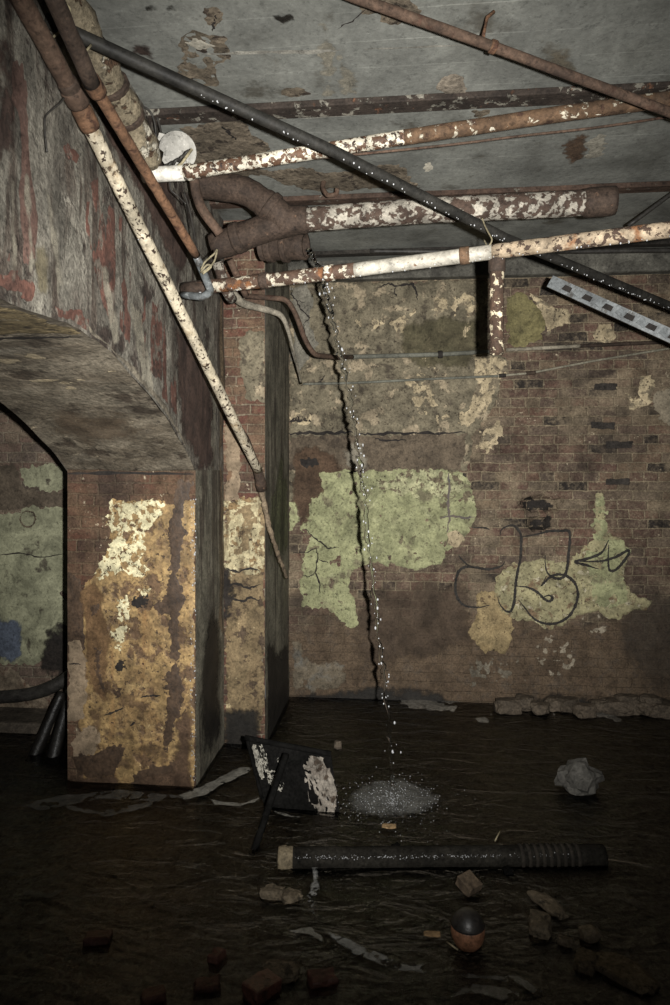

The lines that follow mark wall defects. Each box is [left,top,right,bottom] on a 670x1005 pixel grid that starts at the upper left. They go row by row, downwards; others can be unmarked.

spalling [177,7,231,87]
peeling [506,292,571,347]
peeling [20,463,68,493]
peeling [289,279,509,628]
peeling [0,505,68,690]
crack [293,529,339,595]
peeling [468,493,652,654]
peeling [67,498,195,790]
peeling [0,697,50,709]